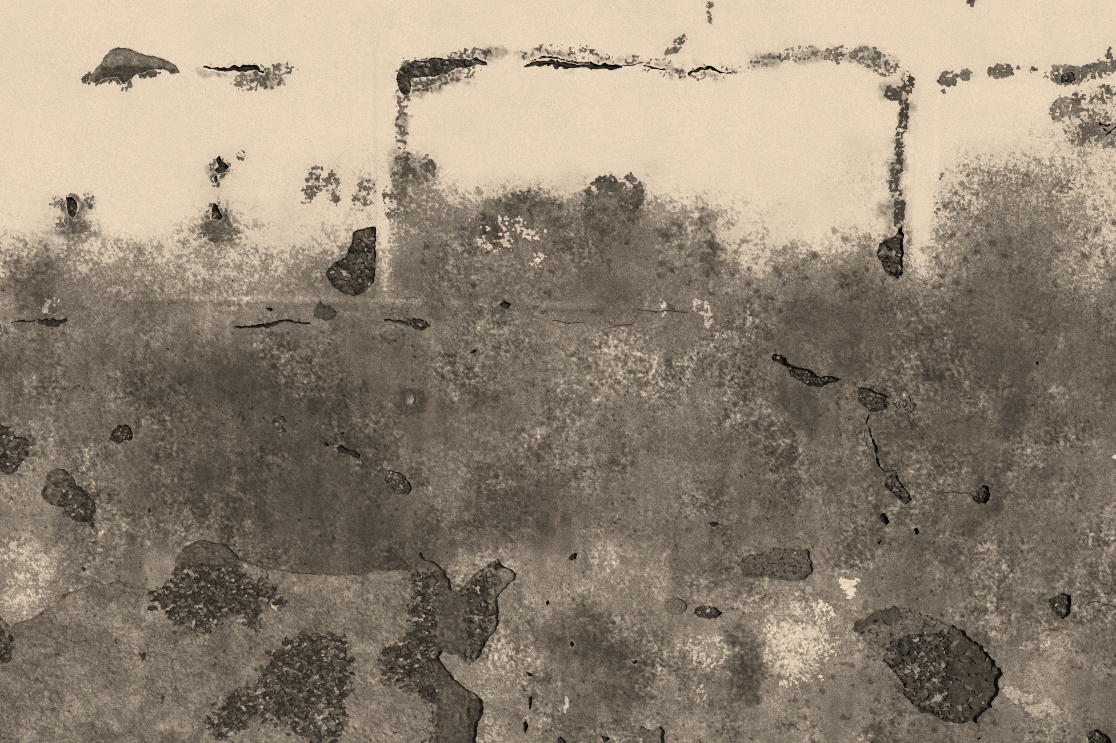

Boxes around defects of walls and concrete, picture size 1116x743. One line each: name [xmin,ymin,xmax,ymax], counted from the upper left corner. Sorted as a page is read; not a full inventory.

flaking render [81,47,181,92]
flaking render [301,47,491,226]
peeling [520,33,915,281]
peeling [937,68,973,94]
peeling [988,47,1116,149]
flaking render [324,225,378,297]
peeling [461,172,645,266]
leakage [698,208,720,260]
crack [0,317,68,335]
crack [863,410,898,478]
spalling [0,538,518,743]
flaking render [850,605,1034,725]